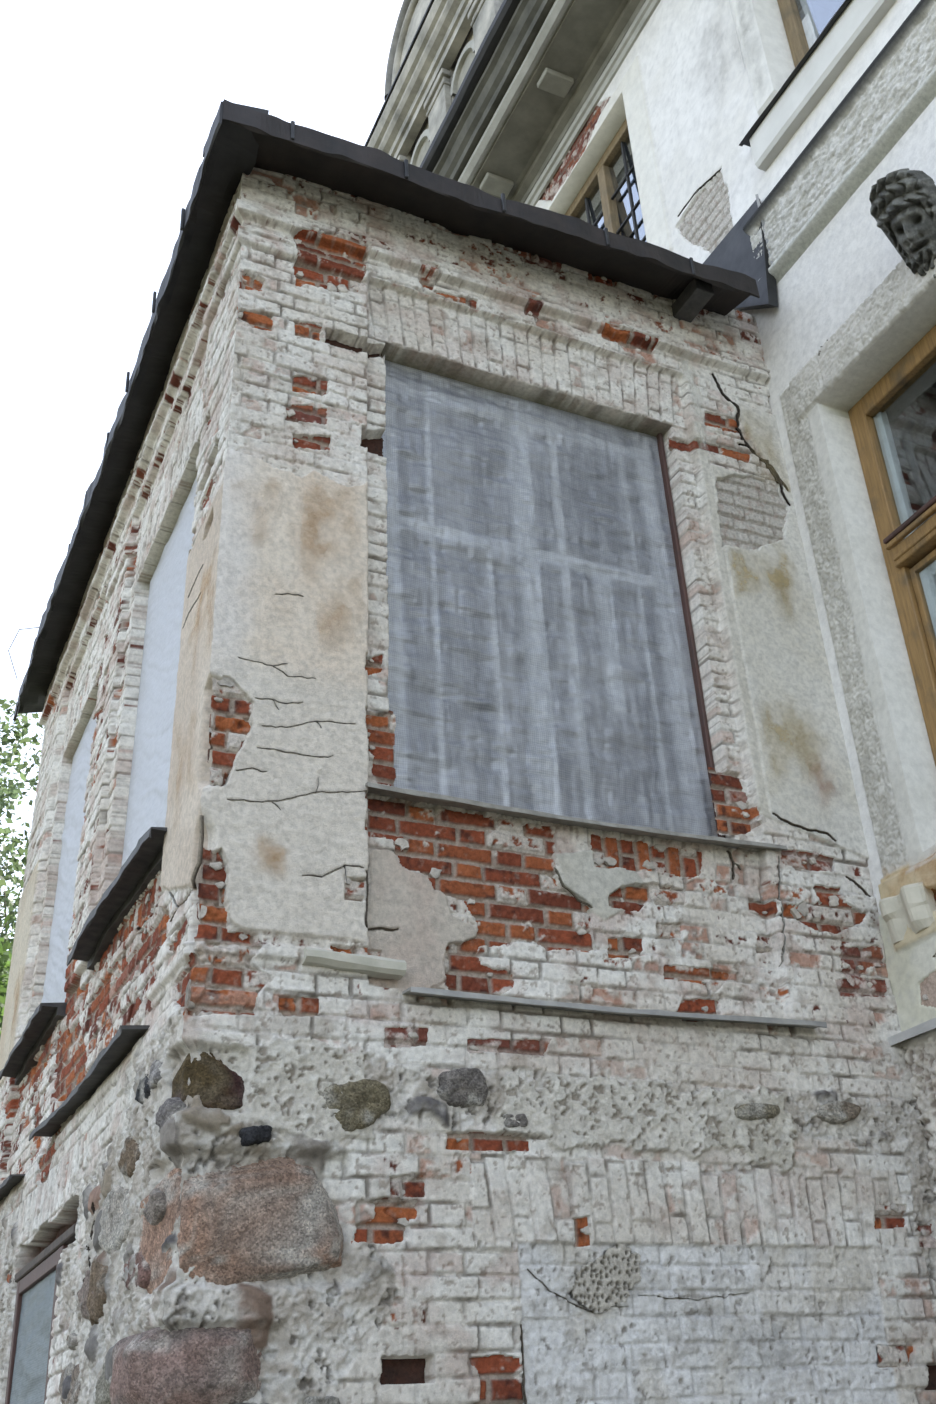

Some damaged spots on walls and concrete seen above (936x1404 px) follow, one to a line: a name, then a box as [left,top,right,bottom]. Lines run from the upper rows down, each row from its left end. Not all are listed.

spalling [293,229,372,292]
crack [711,373,791,506]
spalling [207,677,253,787]
crack [169,657,367,922]
spalling [708,767,767,836]
spalling [365,710,681,996]
flaking render [590,834,702,912]
spalling [748,849,887,998]
flaking render [663,965,729,1022]
flaking render [384,1025,428,1049]
crack [527,1268,743,1312]
crack [519,1324,527,1404]